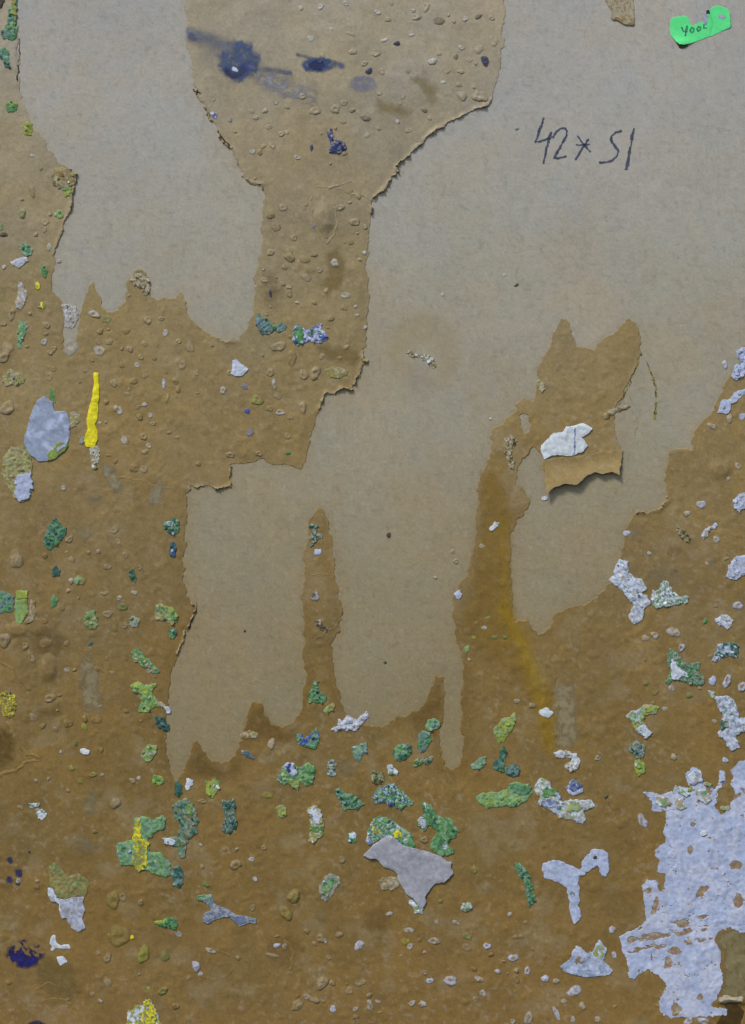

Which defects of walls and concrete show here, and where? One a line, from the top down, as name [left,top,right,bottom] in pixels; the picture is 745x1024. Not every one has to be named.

peeling [0,0,328,349]
peeling [116,0,745,926]